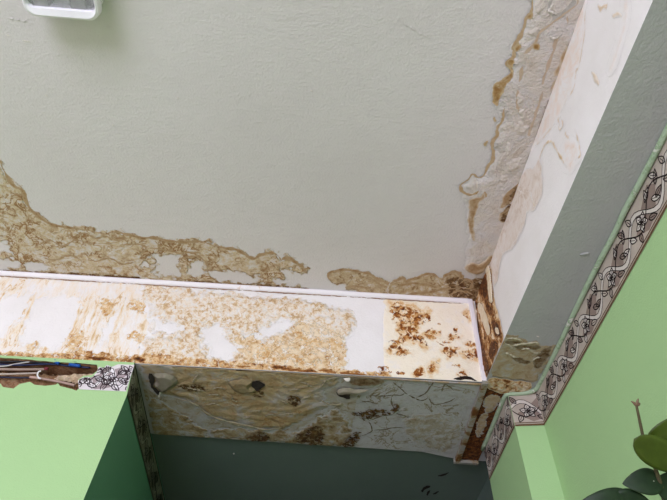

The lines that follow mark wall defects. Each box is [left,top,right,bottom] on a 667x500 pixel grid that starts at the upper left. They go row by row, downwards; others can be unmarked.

flaking render [464,255,493,303]
leakage [0,160,481,454]
flaking render [0,356,98,391]
peeling [336,377,392,399]
peeling [488,334,556,383]
crack [347,372,493,454]